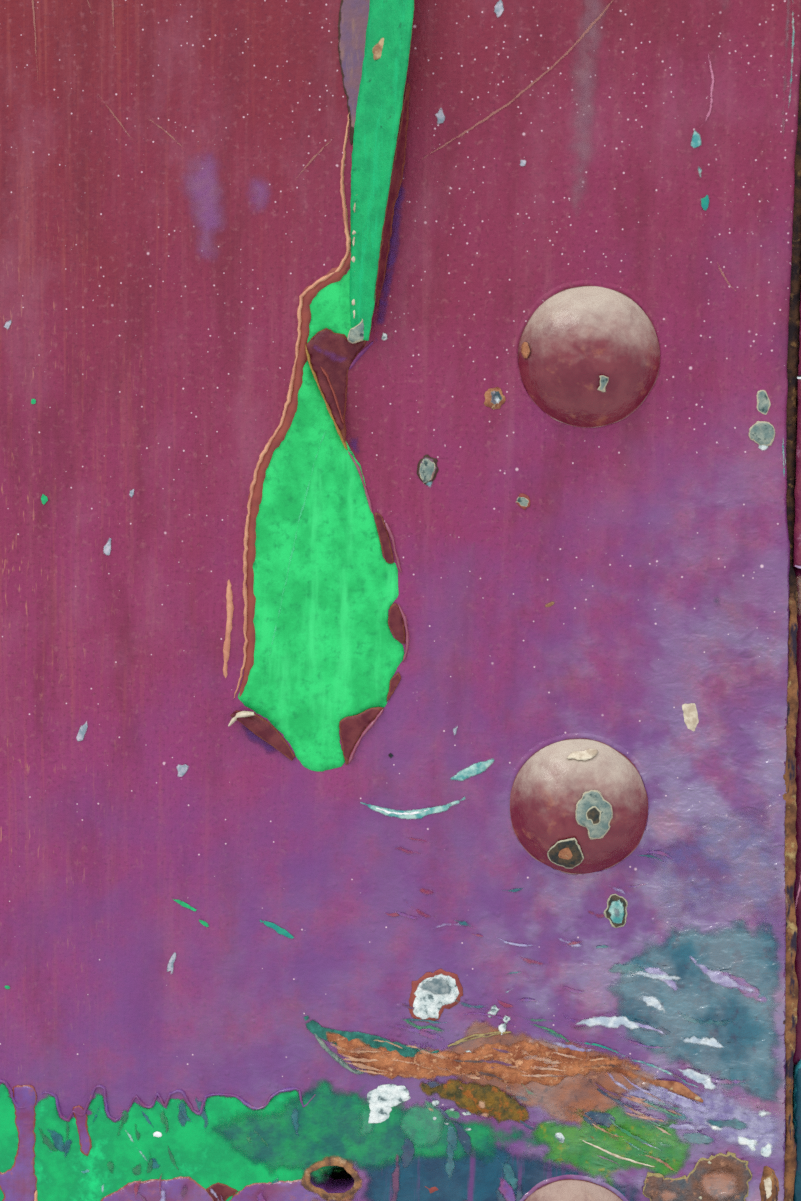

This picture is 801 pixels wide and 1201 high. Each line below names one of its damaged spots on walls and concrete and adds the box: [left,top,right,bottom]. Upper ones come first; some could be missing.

peeling [223,0,414,771]
peeling [409,969,463,1023]
peeling [0,1079,327,1201]
peeling [367,1084,410,1123]
rust [304,1016,752,1201]